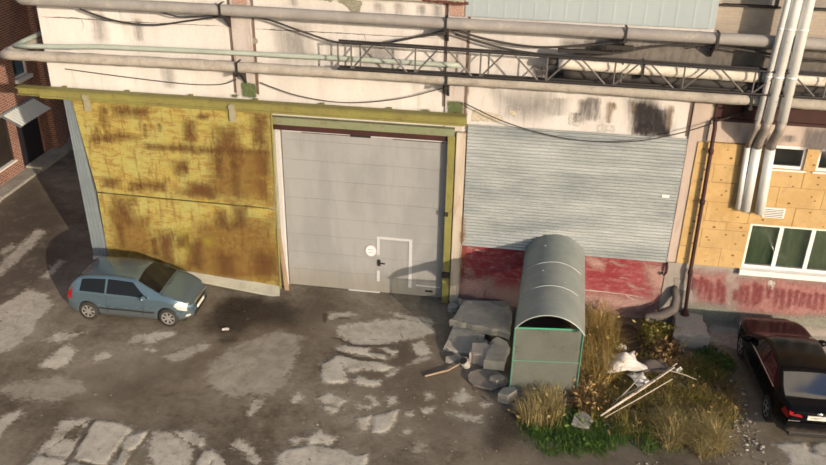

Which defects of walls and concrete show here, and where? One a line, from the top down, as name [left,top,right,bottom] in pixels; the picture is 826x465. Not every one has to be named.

rust [116,107,146,116]
leakage [575,98,598,119]
leakage [631,99,670,136]
rust [114,200,184,264]
rust [187,208,275,280]
peeling [459,268,494,301]
peeling [585,264,826,356]